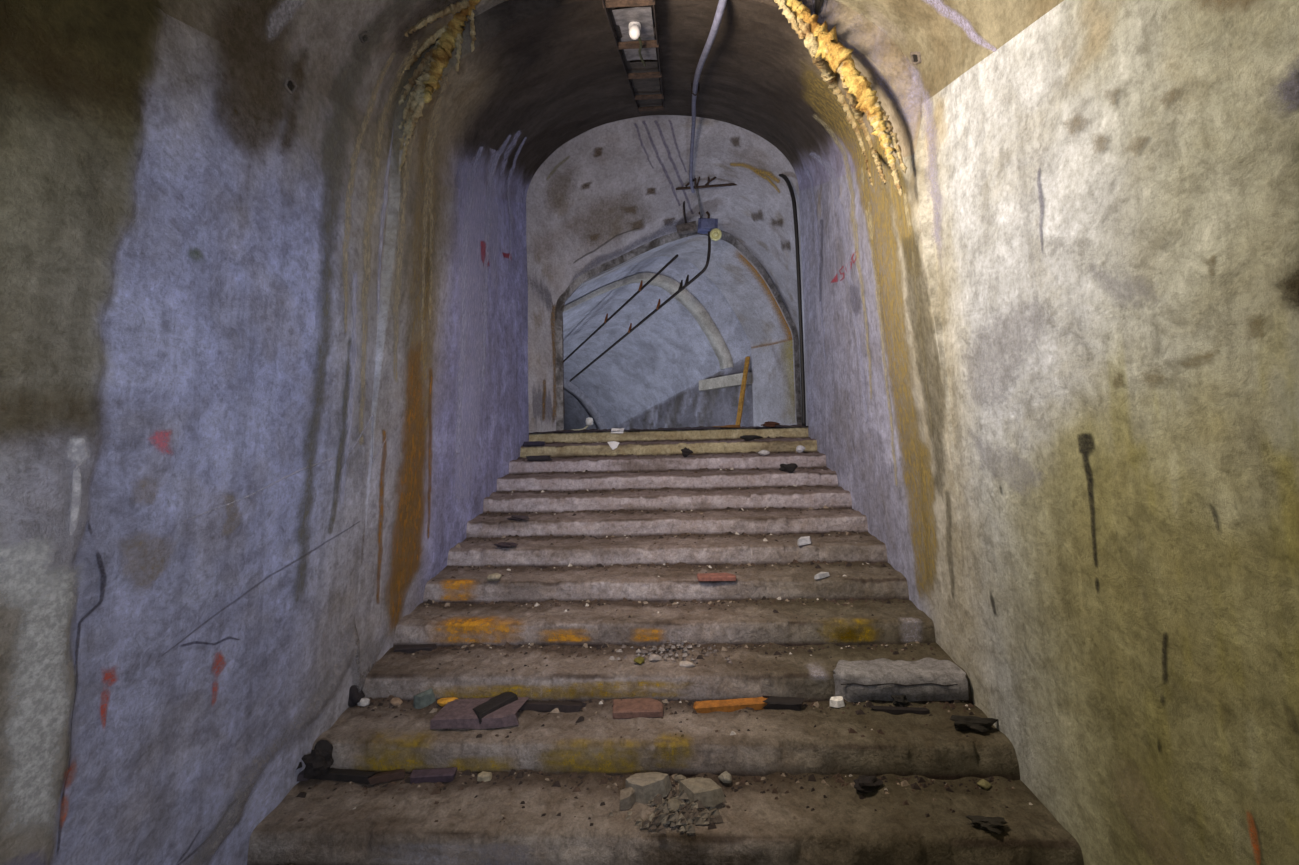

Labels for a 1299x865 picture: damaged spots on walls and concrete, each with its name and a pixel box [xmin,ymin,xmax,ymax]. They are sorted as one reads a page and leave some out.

damp [296,0,481,601]
rust [377,352,432,624]
damp [456,131,526,496]
damp [573,121,693,280]
damp [774,0,954,593]
damp [927,0,996,51]